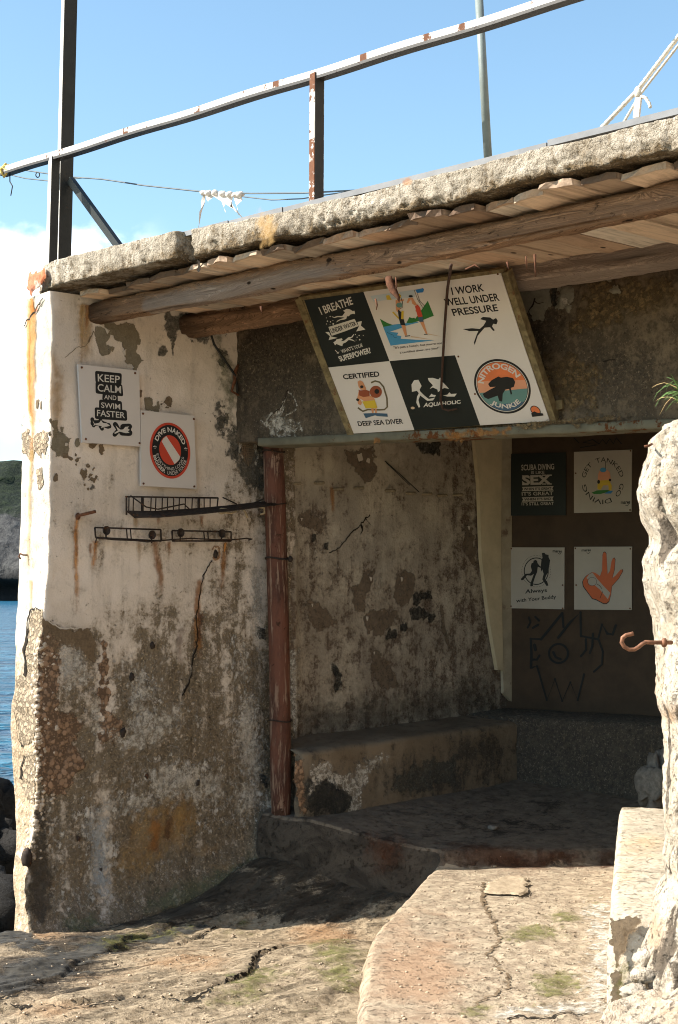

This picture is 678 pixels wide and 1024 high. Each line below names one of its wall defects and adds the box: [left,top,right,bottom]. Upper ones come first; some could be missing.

rust [27,300,36,434]
flaking render [94,322,144,370]
flaking render [21,418,105,490]
flaking render [344,446,377,483]
rust [74,519,97,590]
crack [329,514,371,553]
crack [182,561,212,696]
water stain [304,753,387,817]
crack [0,946,277,1010]
crack [473,882,588,1020]